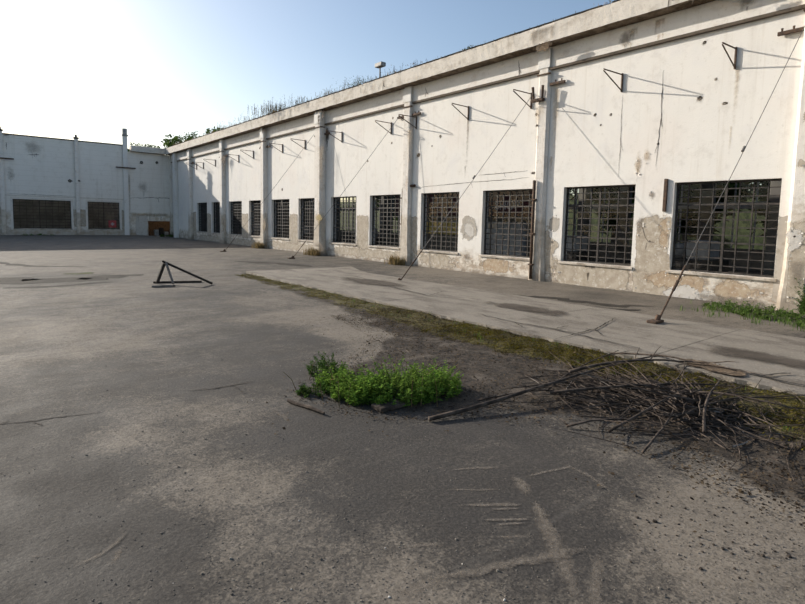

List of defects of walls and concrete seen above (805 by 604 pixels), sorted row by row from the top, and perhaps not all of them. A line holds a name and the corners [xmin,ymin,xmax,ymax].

peeling [544,215,805,304]